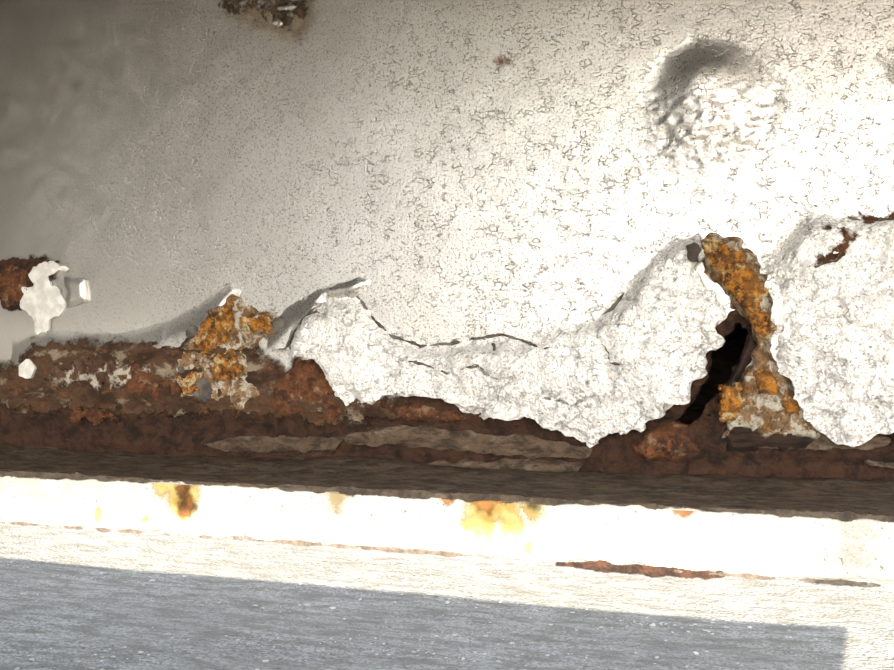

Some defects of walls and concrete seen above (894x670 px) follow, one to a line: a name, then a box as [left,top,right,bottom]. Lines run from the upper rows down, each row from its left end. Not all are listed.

corrosion [0,232,894,481]
crack [356,295,549,379]
peeling [284,233,726,448]
crack [603,293,624,315]
peeling [760,209,894,447]
corrosion [0,470,894,557]